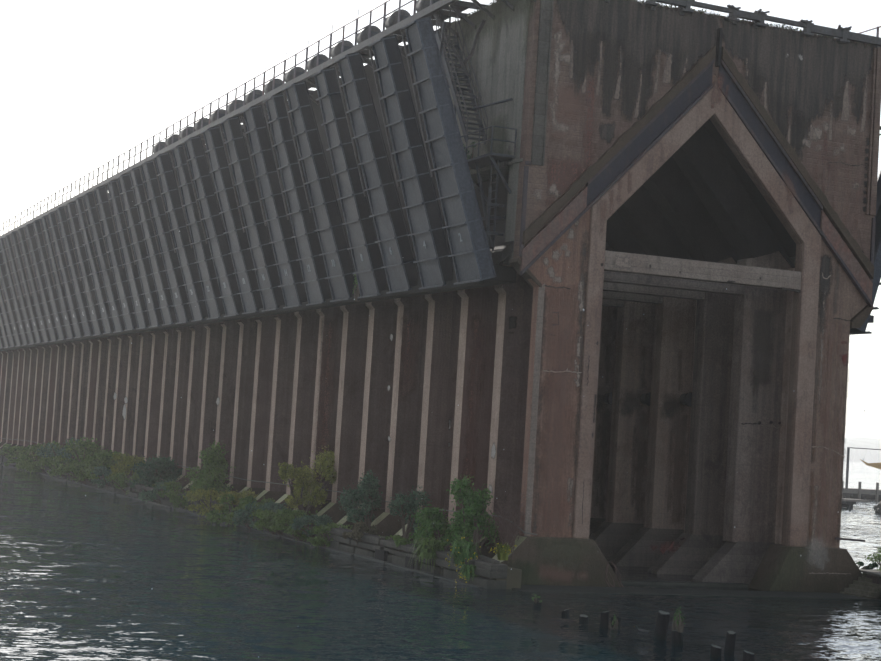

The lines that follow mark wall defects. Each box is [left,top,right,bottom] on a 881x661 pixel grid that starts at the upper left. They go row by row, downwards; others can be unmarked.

water stain [555,0,875,158]
peeling [802,72,869,212]